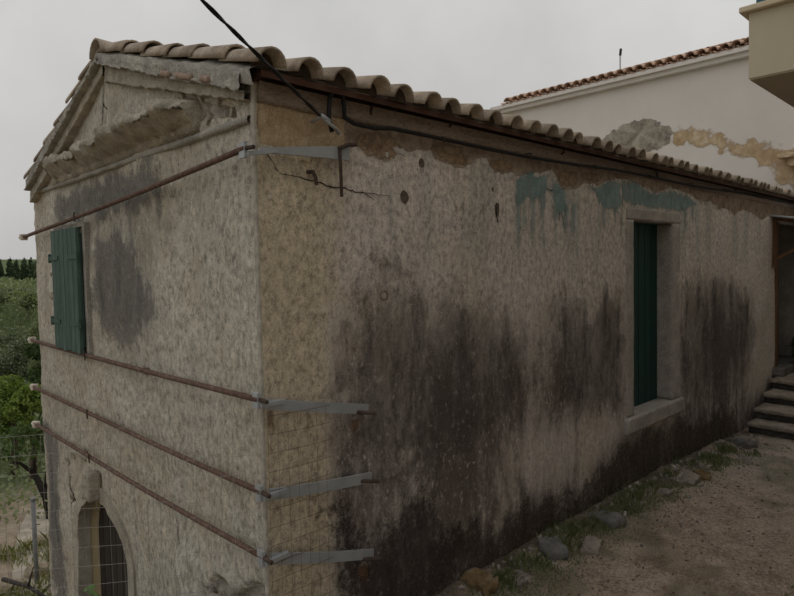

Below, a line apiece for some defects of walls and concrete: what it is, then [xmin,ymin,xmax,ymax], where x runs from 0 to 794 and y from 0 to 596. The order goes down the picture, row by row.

peeling [257,102,794,220]
damp [315,478,467,596]